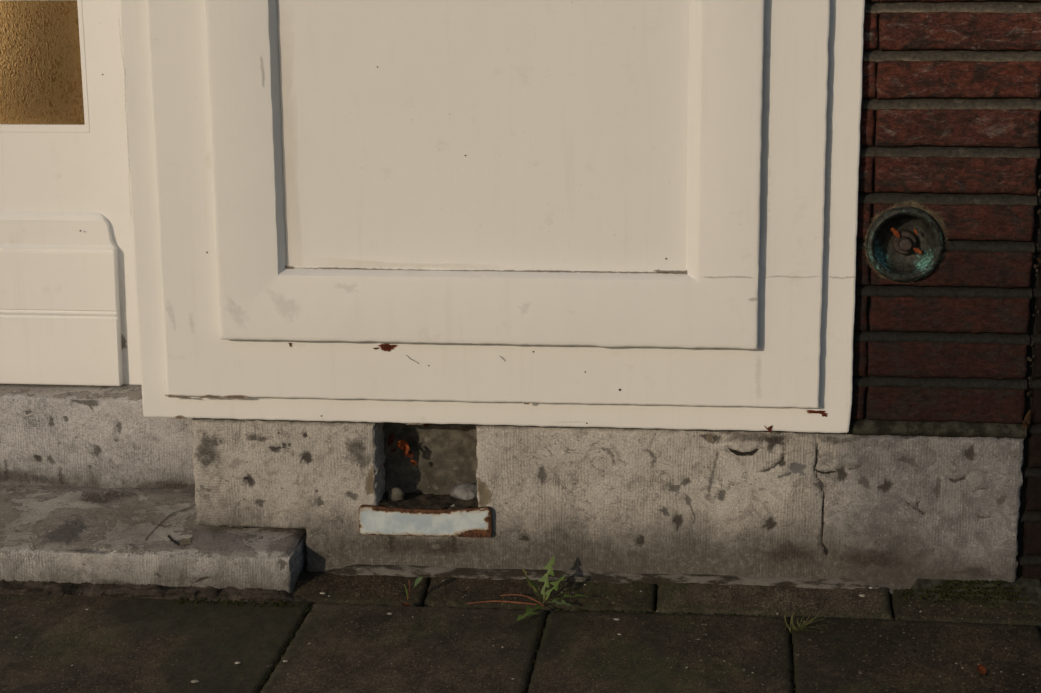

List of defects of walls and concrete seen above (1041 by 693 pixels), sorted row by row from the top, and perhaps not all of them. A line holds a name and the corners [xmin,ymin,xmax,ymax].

crack [728,447,785,472]
crack [814,443,861,555]